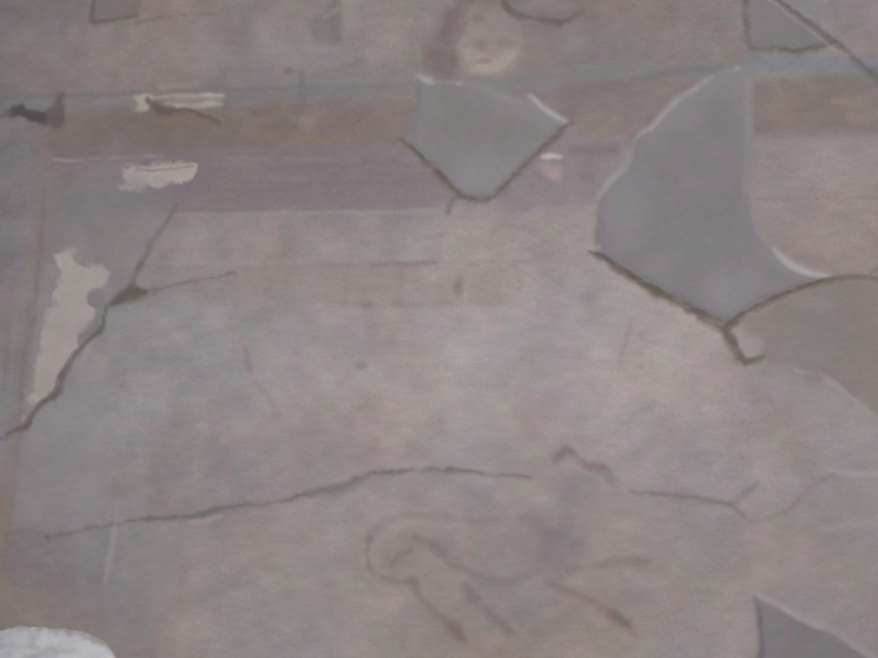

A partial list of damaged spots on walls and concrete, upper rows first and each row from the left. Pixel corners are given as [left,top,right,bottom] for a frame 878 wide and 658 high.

crack [738,0,878,102]
flaking render [131,79,228,127]
flaking render [120,158,200,185]
flaking render [16,247,111,423]
crack [0,202,240,444]
crack [585,249,878,369]
crack [95,463,534,532]
crack [626,473,838,527]